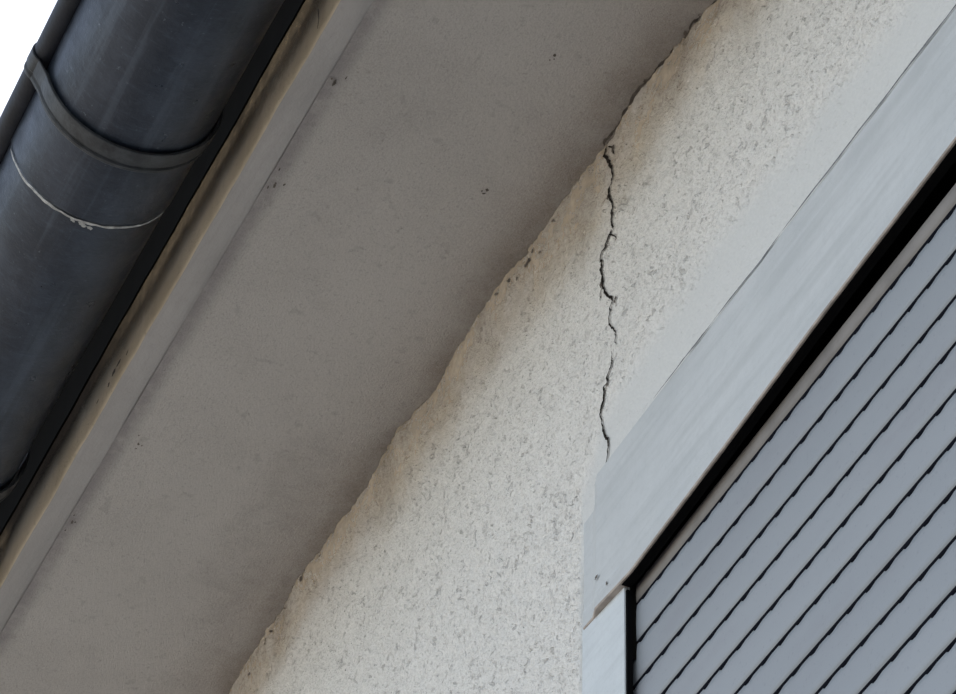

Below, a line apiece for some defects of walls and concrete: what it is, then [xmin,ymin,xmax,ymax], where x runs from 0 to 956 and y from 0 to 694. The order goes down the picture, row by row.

crack [599,0,718,462]